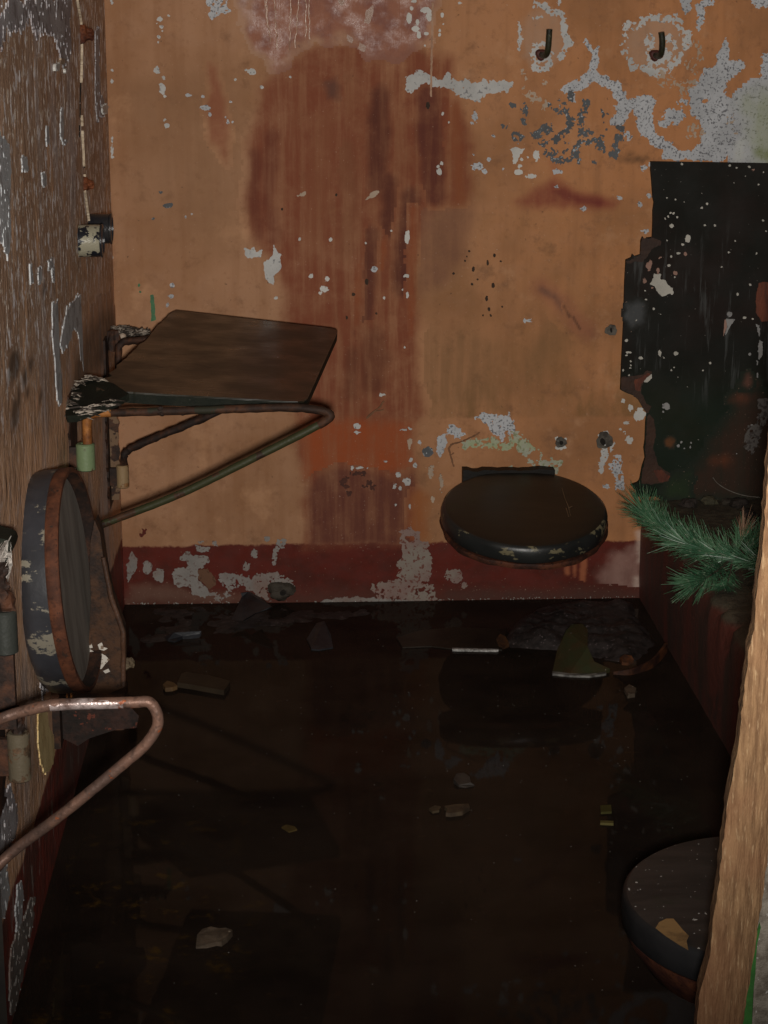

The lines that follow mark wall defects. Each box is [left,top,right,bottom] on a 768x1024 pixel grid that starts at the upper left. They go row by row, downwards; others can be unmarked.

peeling [0,0,72,73]
peeling [405,0,764,188]
peeling [0,132,47,261]
corrosion [509,152,627,216]
peeling [244,245,282,300]
leakage [233,0,606,559]
peeling [626,197,691,315]
peeling [51,293,84,407]
peeling [723,282,768,378]
peeling [393,412,567,503]
peeling [126,536,295,602]
peeling [322,526,468,602]